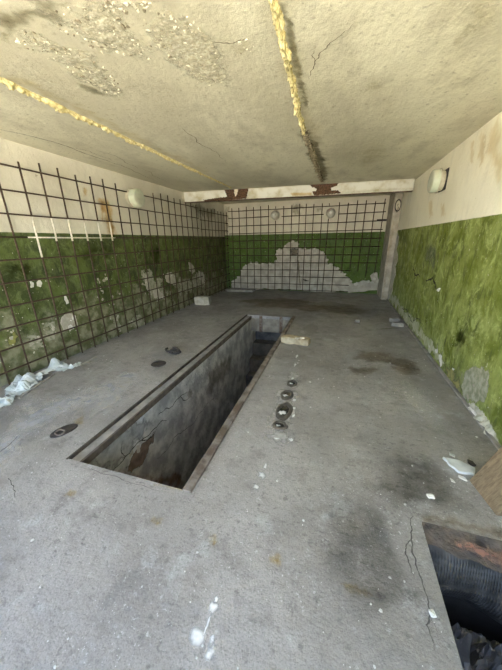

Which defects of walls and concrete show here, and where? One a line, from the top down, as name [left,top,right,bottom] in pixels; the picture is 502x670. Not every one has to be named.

spalling [15,31,121,97]
spalling [58,0,225,87]
crack [310,27,351,75]
rust [203,188,248,202]
rust [310,183,341,195]
spalling [0,161,386,385]
peeling [461,366,492,403]
crack [82,394,185,492]
crack [404,516,437,645]